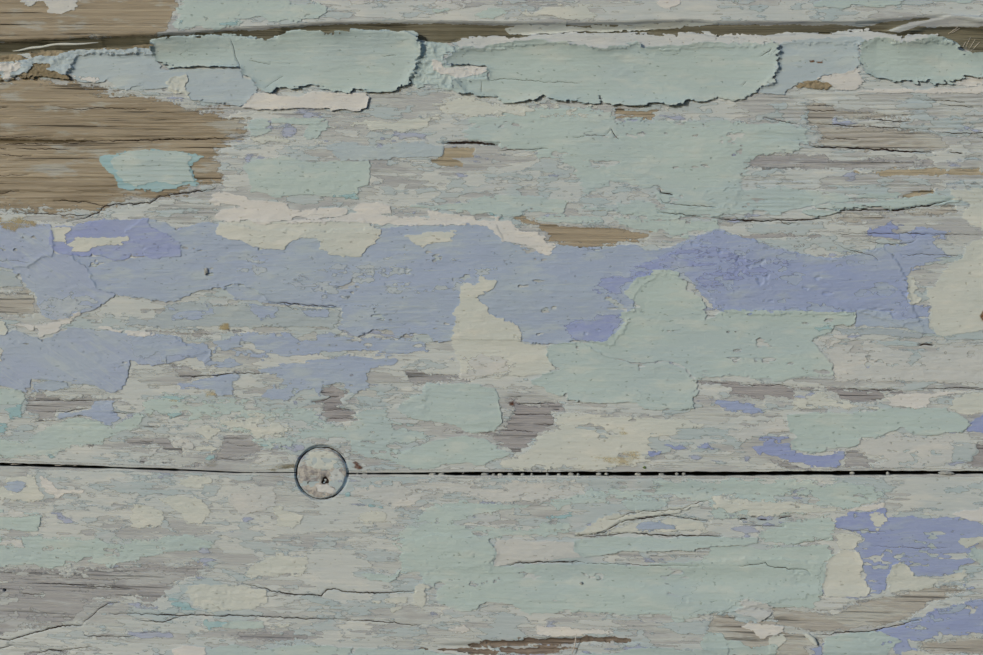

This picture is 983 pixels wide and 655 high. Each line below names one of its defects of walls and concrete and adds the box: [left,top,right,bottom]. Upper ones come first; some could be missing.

crack [58,97,147,110]
crack [0,136,244,220]
peeling [0,0,983,475]
crack [0,577,413,653]
peeling [169,552,309,630]
peeling [345,477,983,655]